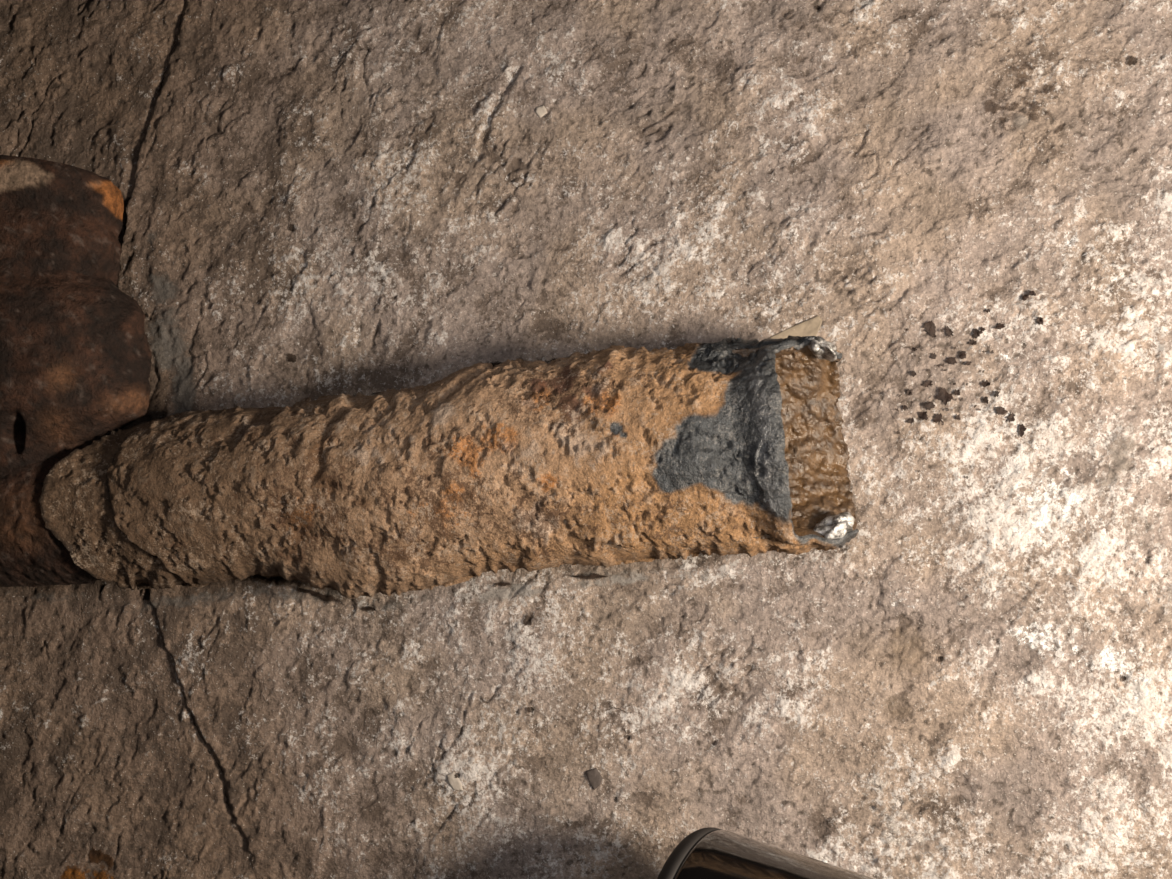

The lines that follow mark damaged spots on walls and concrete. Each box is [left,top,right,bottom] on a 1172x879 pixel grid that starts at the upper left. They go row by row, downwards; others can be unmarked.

crack [132,5,185,92]
crack [171,663,241,833]